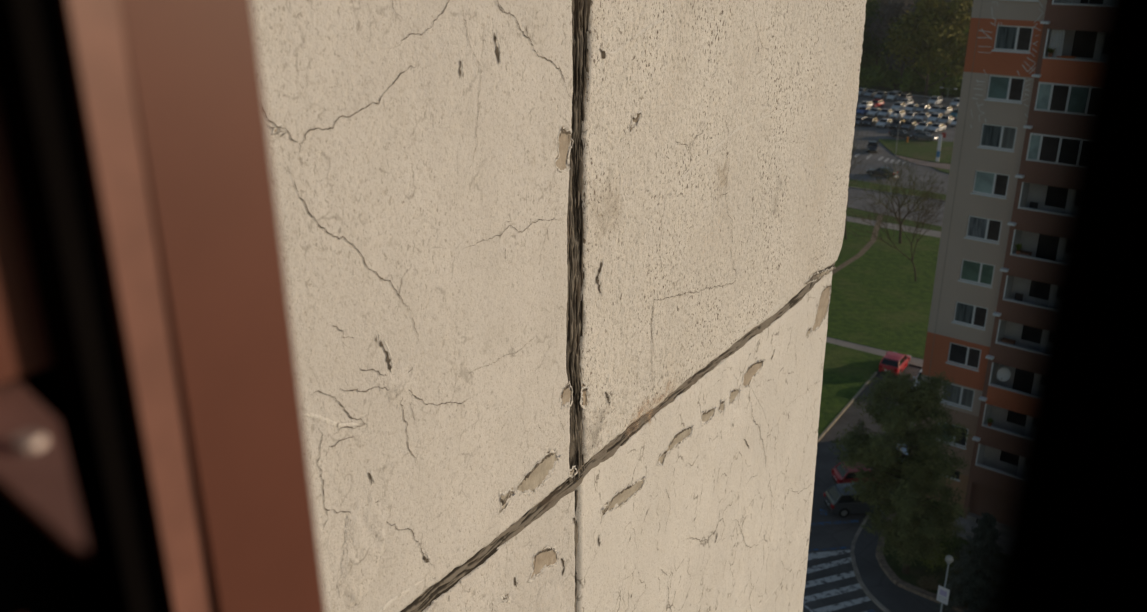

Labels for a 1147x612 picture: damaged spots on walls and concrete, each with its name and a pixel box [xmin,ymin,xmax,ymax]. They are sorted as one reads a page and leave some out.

crack [497,0,579,106]
crack [265,1,482,340]
peeling [554,125,573,175]
crack [472,218,557,259]
peeling [804,267,834,339]
peeling [656,349,775,467]
crack [313,366,466,528]
peeling [499,449,578,514]
peeling [598,476,646,546]
peeling [500,545,566,604]